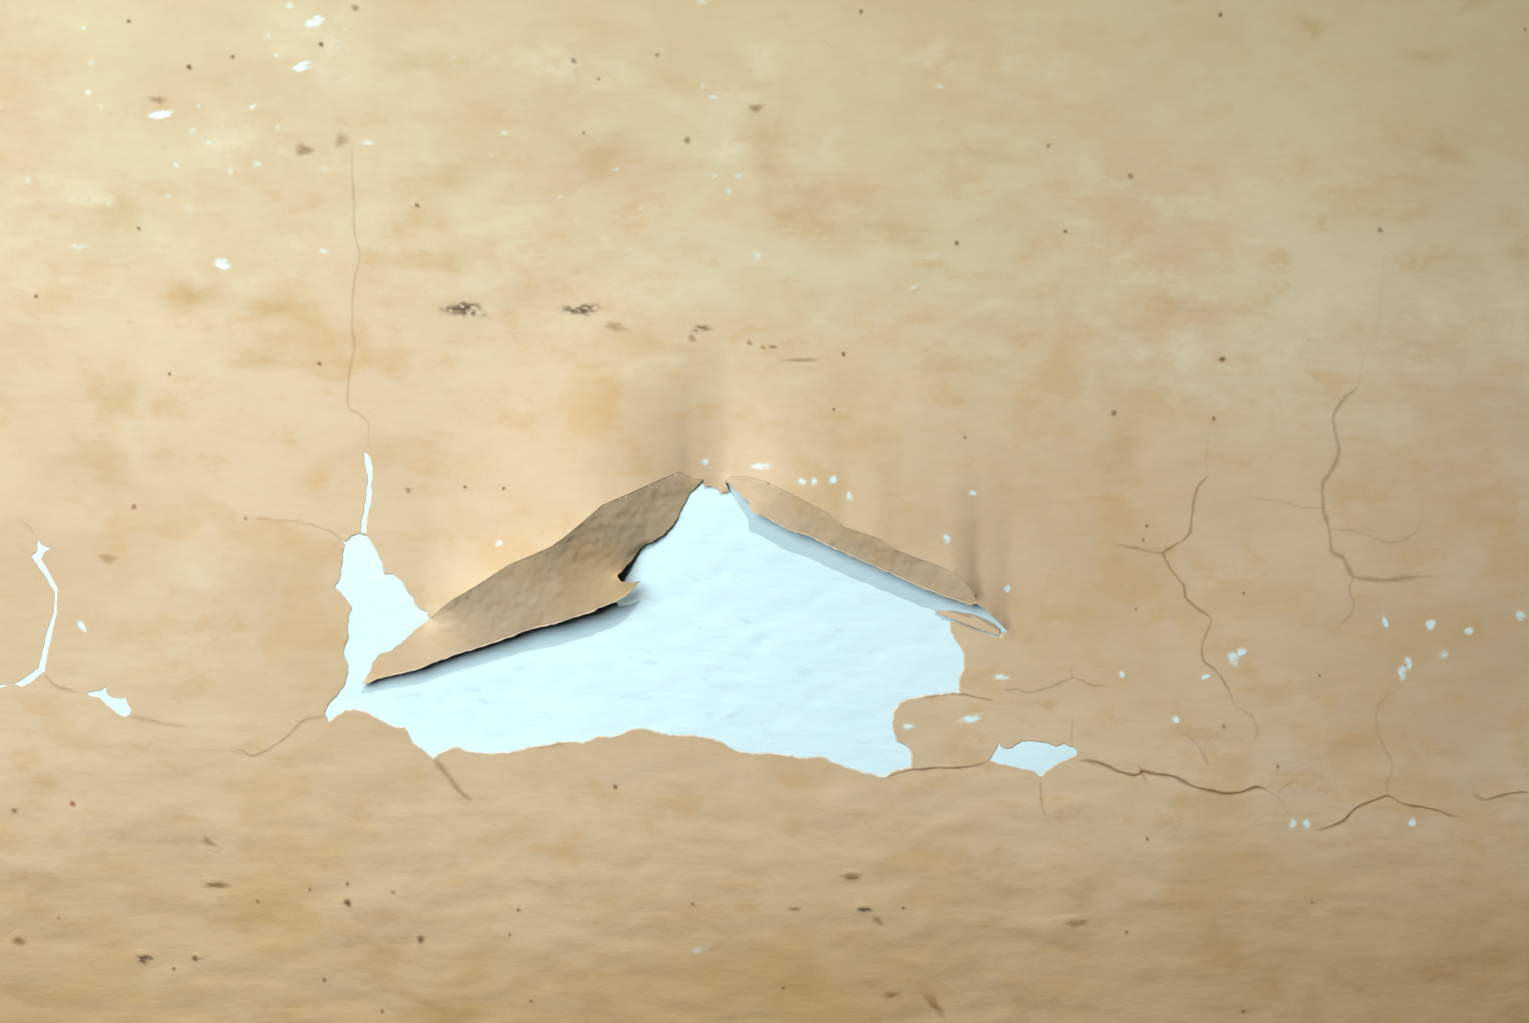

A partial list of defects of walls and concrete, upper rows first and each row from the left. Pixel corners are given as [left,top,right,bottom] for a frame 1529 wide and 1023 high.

peeling [324,457,1008,778]
peeling [992,673,1012,681]
peeling [87,686,131,717]
peeling [989,740,1077,777]